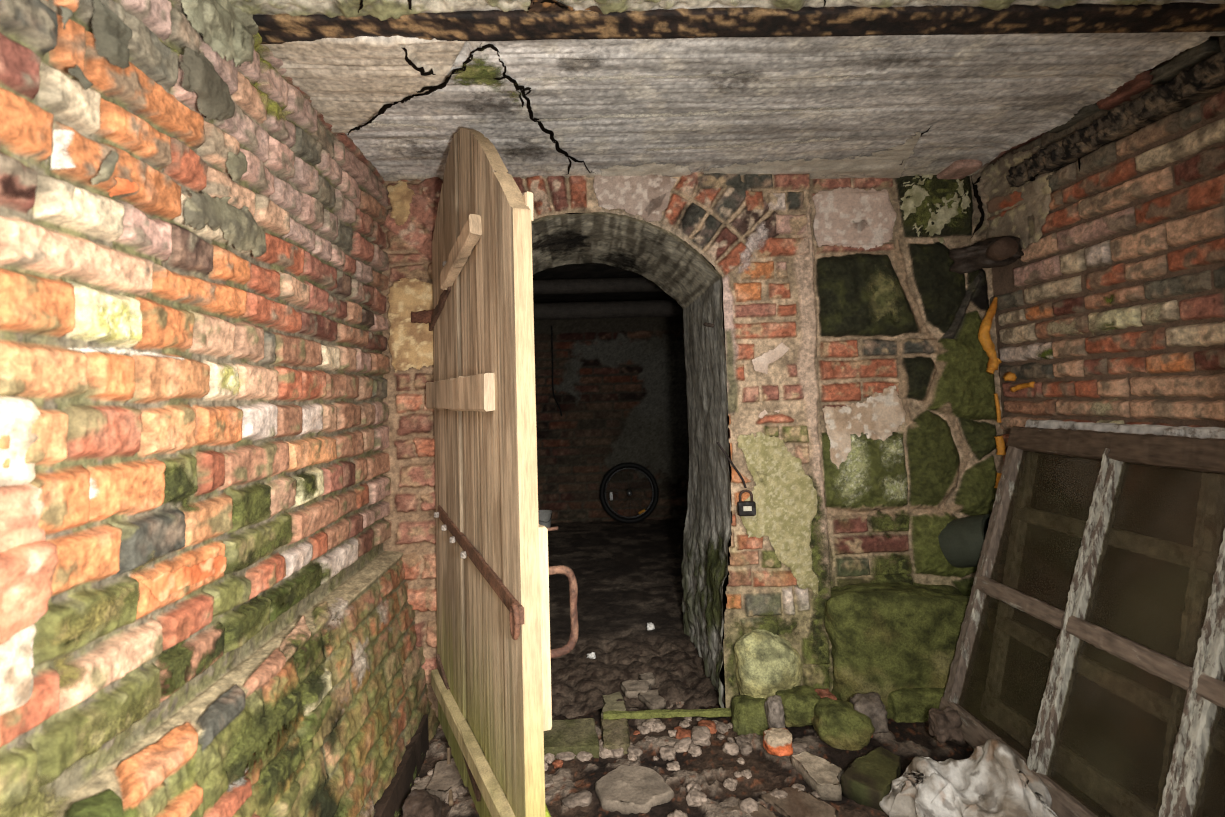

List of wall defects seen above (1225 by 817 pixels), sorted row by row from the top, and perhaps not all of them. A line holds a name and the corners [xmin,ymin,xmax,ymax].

crack [341,43,596,175]
peeling [752,342,789,374]
peeling [822,385,906,469]
peeling [737,409,819,597]
water stain [327,597,348,629]
water stain [351,643,369,686]
water stain [326,699,347,750]
water stain [310,775,339,817]